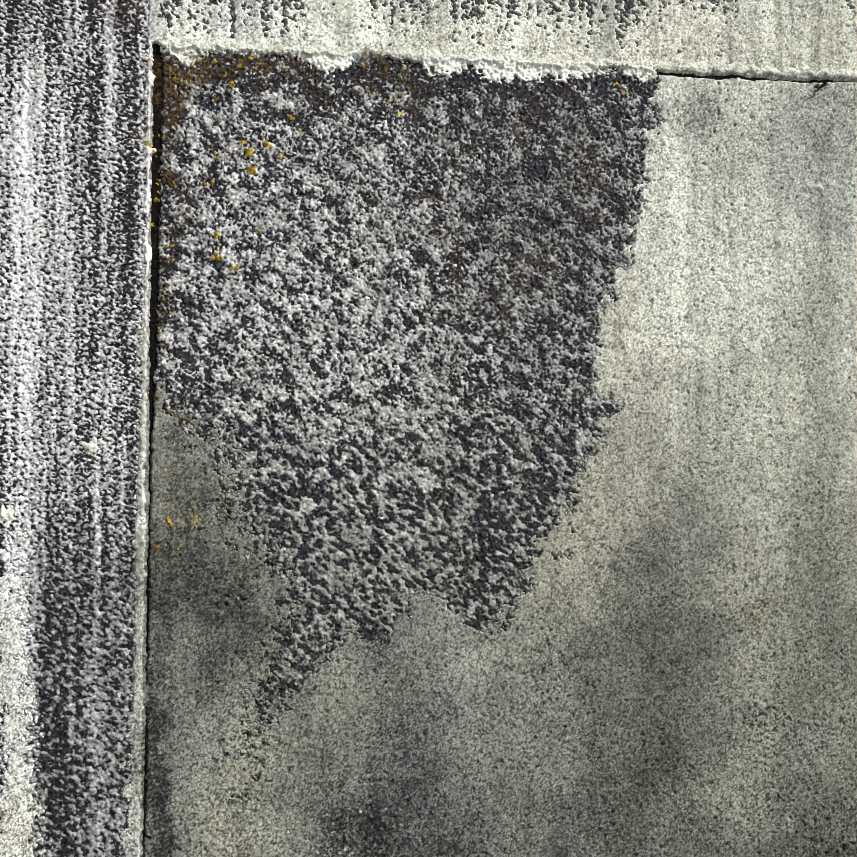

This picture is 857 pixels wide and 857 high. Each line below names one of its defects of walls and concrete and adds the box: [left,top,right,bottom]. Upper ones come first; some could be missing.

peeling [359,0,747,52]
crack [659,72,854,93]
peeling [0,0,665,857]
water stain [148,423,263,701]
water stain [133,664,177,857]
water stain [378,718,428,799]
water stain [309,799,400,857]